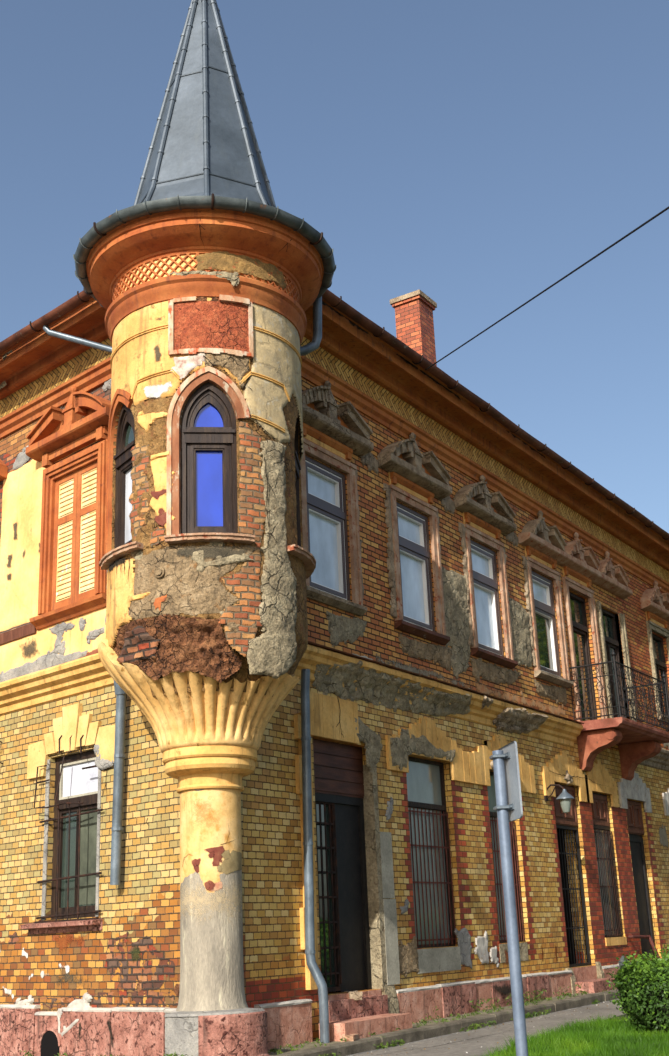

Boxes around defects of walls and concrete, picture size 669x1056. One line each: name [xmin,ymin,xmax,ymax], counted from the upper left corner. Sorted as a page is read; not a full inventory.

spalling [168,251,286,289]
spalling [0,418,41,457]
spalling [47,352,267,683]
spalling [312,654,566,734]
peeling [180,846,242,917]